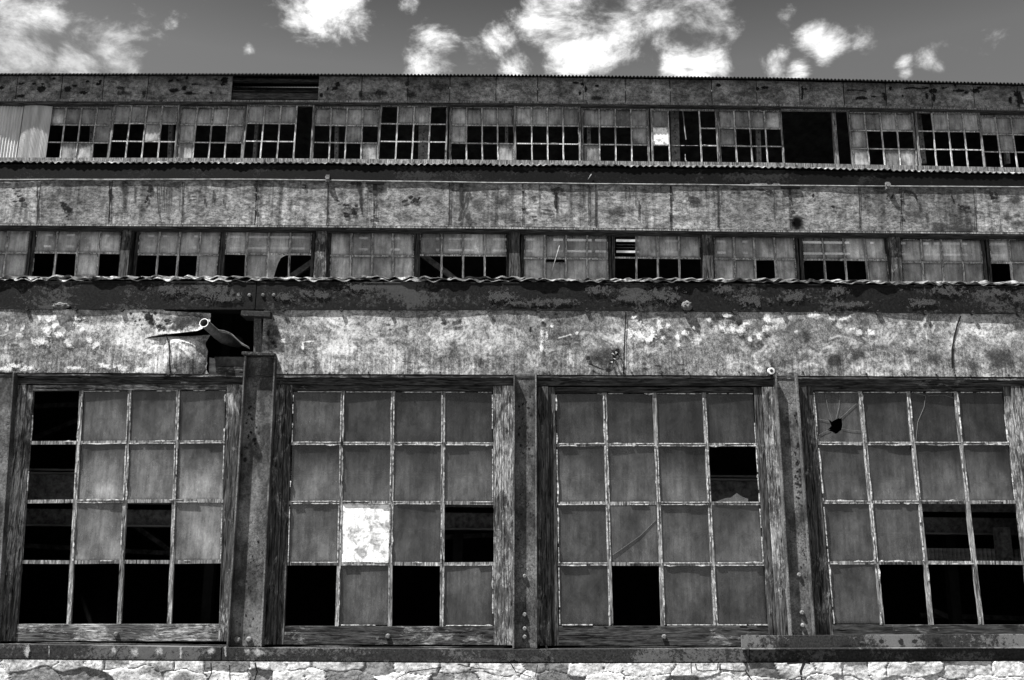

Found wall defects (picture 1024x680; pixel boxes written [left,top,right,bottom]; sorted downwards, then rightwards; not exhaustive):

water stain [121,181,136,211]
water stain [458,183,514,222]
water stain [607,187,640,220]
peeling [7,310,100,348]
peeling [706,283,875,341]